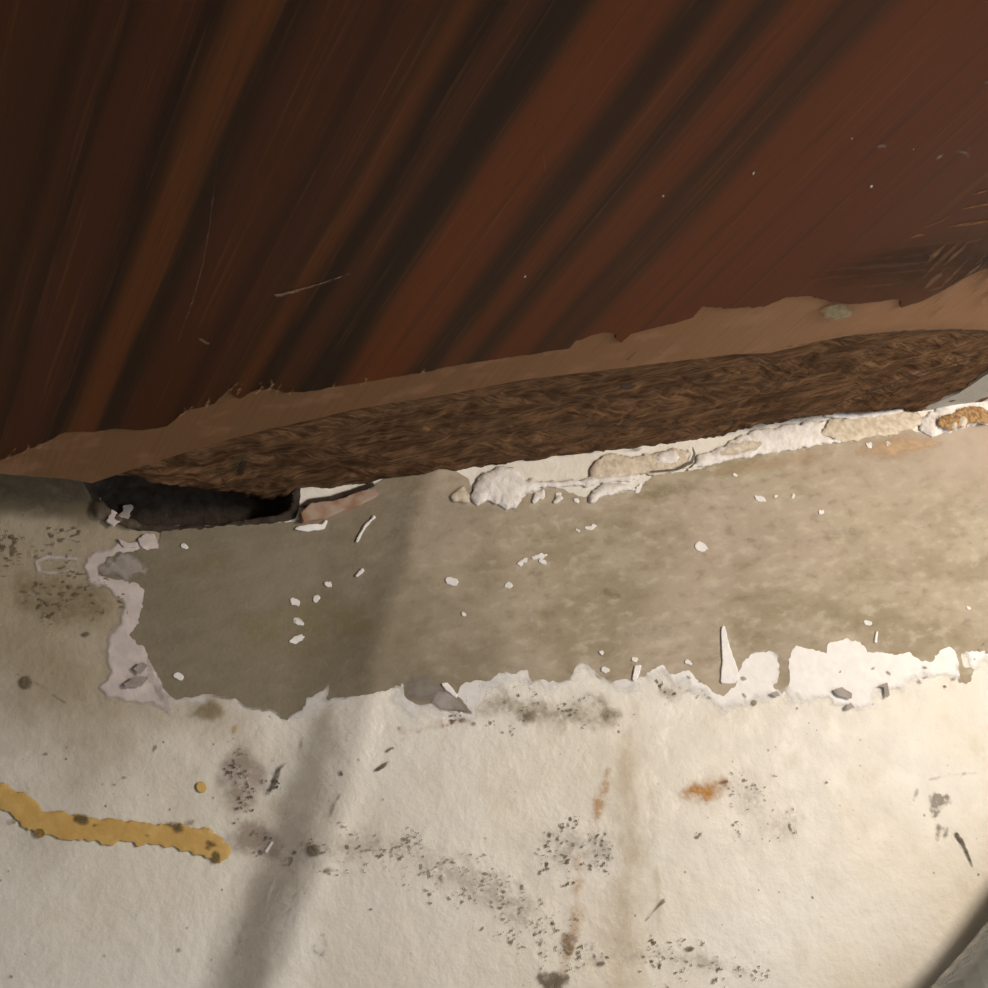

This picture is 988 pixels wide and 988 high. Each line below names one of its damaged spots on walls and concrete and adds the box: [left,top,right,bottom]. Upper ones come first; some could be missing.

peeling [84,401,988,720]
water stain [486,686,546,736]
rust [686,781,727,801]
water stain [338,822,552,949]
water stain [534,816,619,888]
water stain [639,935,725,988]